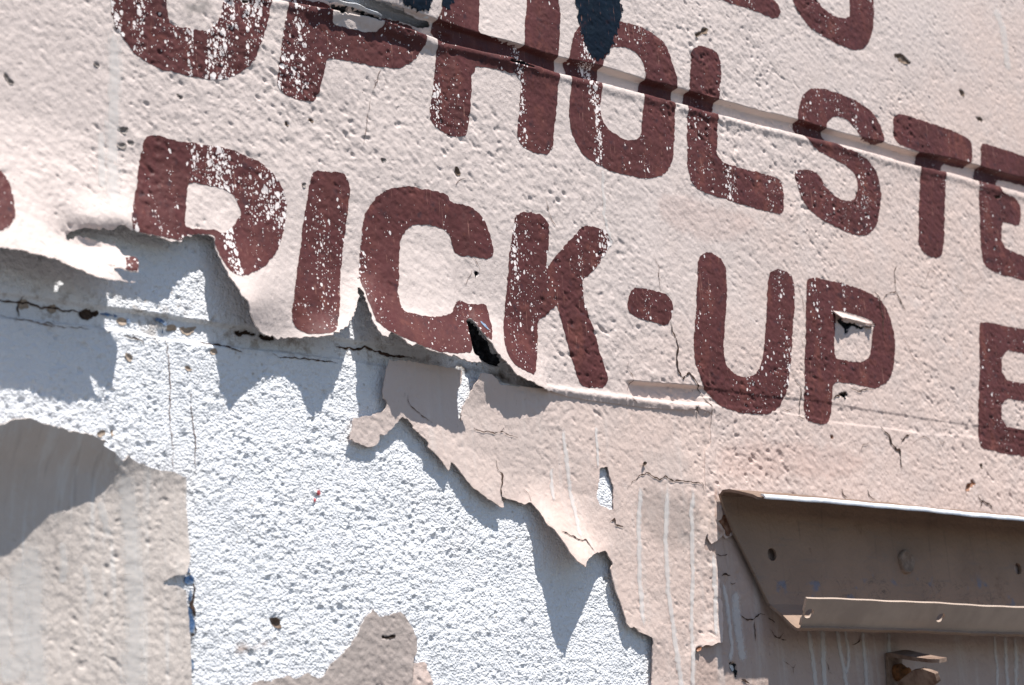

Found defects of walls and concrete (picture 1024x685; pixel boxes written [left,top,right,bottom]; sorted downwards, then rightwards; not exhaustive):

crack [0,296,84,329]
peeling [833,311,875,333]
crack [201,342,242,352]
crack [275,345,411,363]
crack [671,324,713,424]
peeling [0,169,732,685]
crack [859,427,944,467]
crack [631,472,705,492]